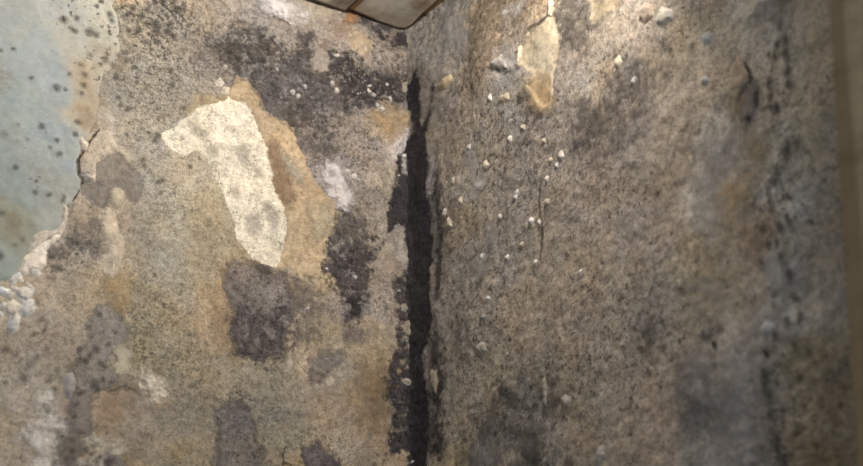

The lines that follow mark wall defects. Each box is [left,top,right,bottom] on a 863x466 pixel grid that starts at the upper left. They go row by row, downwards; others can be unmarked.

damp [128,6,175,43]
damp [224,0,315,71]
damp [354,15,408,49]
peeling [0,0,143,334]
flaking render [161,75,339,282]
damp [222,50,449,466]